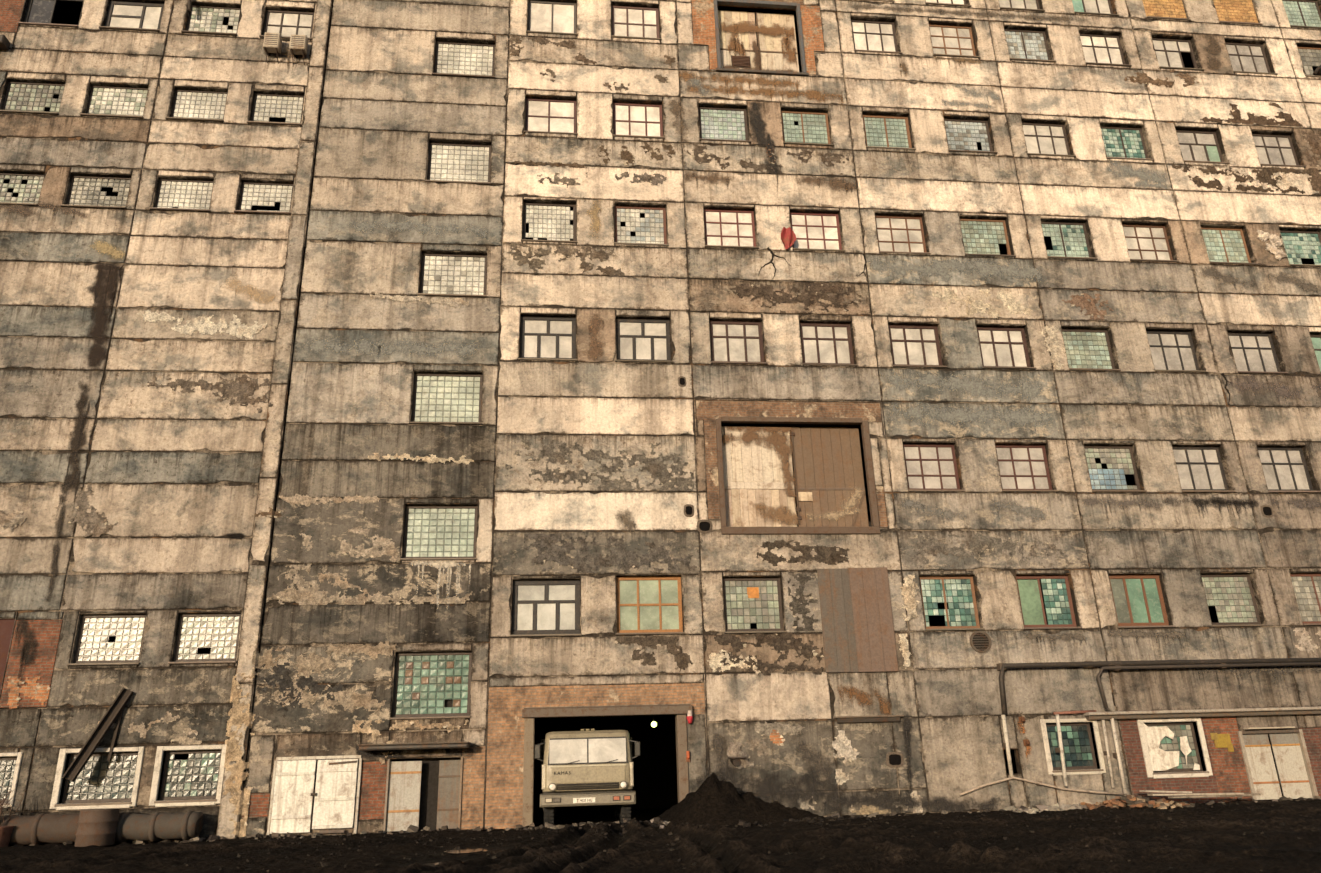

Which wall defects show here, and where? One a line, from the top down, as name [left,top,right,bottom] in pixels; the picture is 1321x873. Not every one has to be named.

flaking render [1124,69,1200,88]
flaking render [1172,102,1321,195]
flaking render [507,243,625,276]
crack [758,247,791,278]
damp [87,263,122,367]
damp [46,384,89,602]
flaking render [505,439,713,533]
flaking render [339,526,400,562]
flaking render [270,533,472,605]
flaking render [614,539,849,676]
spalling [7,676,51,709]
rust [838,687,890,715]